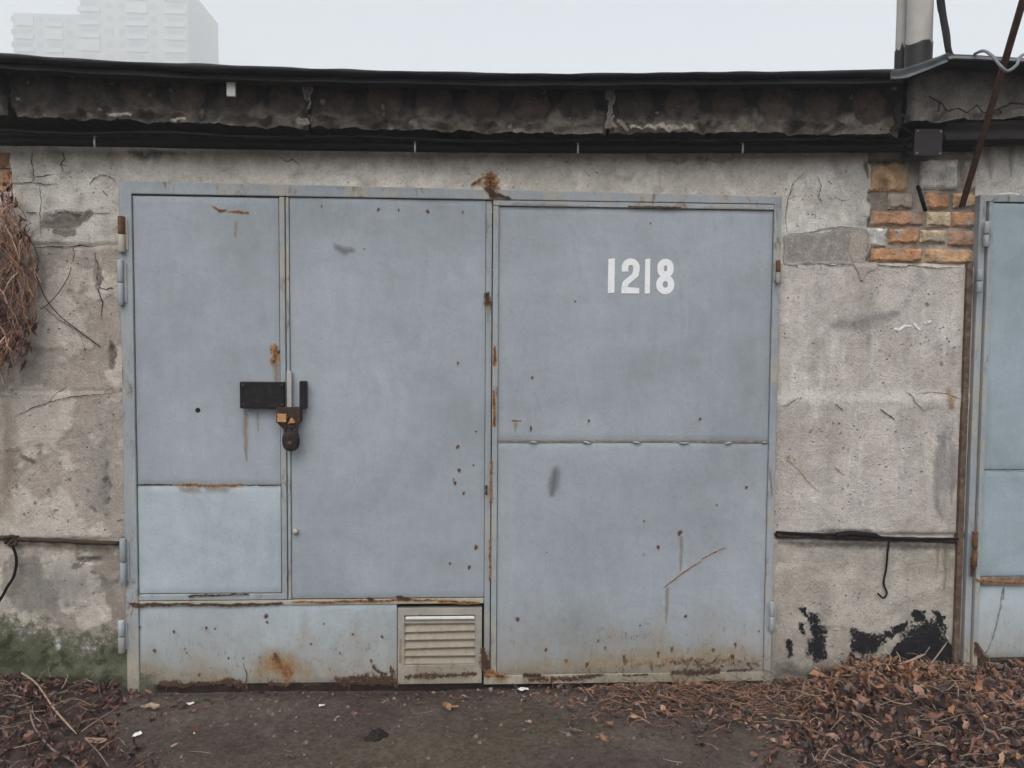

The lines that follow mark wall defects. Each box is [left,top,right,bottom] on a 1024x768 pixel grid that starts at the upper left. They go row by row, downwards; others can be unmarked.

crack [929,96,1024,114]
rust [471,172,511,200]
spalling [867,159,978,264]
crack [12,151,114,315]
crack [42,305,101,360]
rust [269,344,280,366]
crack [18,388,112,415]
rust [130,593,479,624]
rust [264,625,761,688]
rust [158,658,248,690]